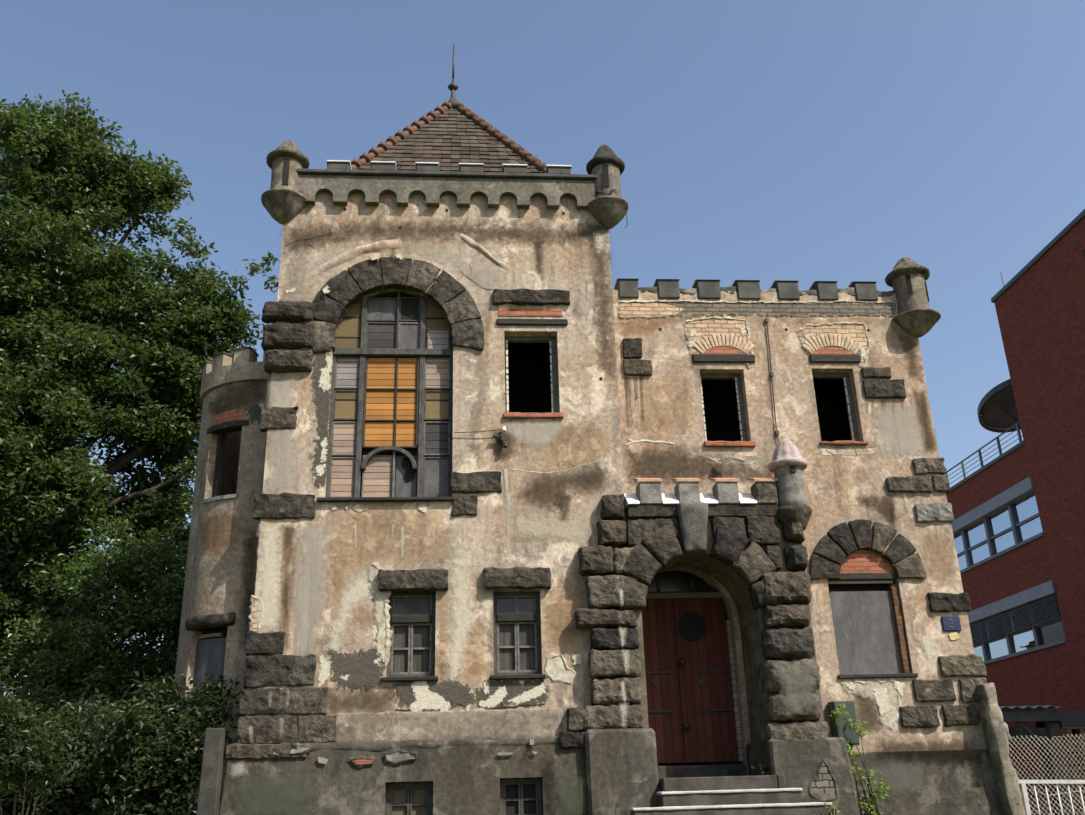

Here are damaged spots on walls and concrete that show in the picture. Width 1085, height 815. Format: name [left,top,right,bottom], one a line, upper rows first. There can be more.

spalling [309,352,335,488]
damp [504,469,588,545]
damp [257,525,325,655]
damp [329,575,373,651]
spalling [318,562,589,712]